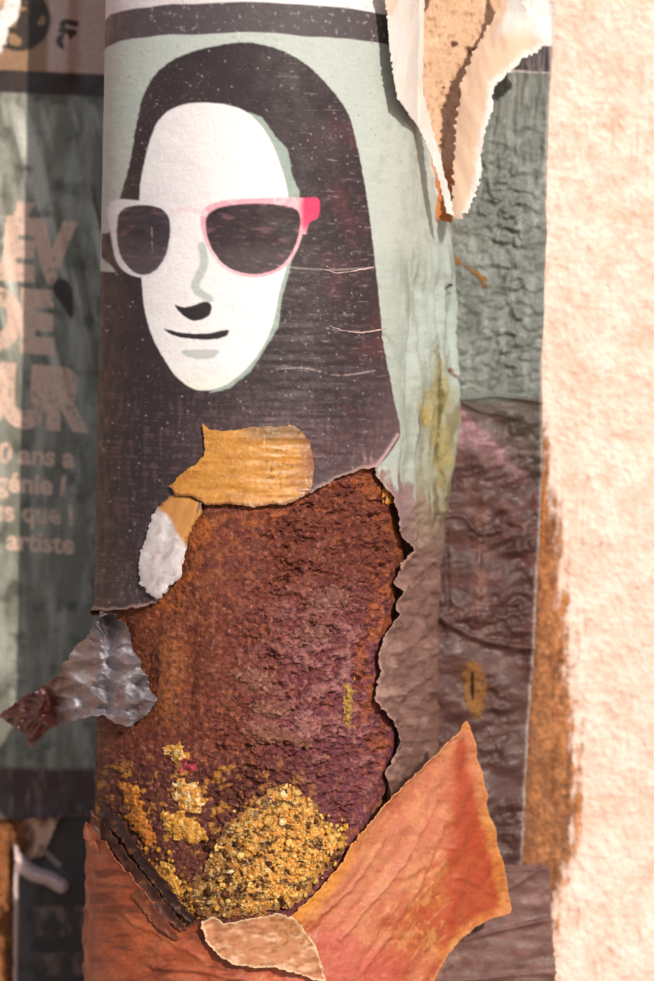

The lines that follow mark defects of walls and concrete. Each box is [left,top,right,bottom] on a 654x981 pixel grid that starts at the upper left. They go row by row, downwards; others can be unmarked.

rust [94,467,404,927]